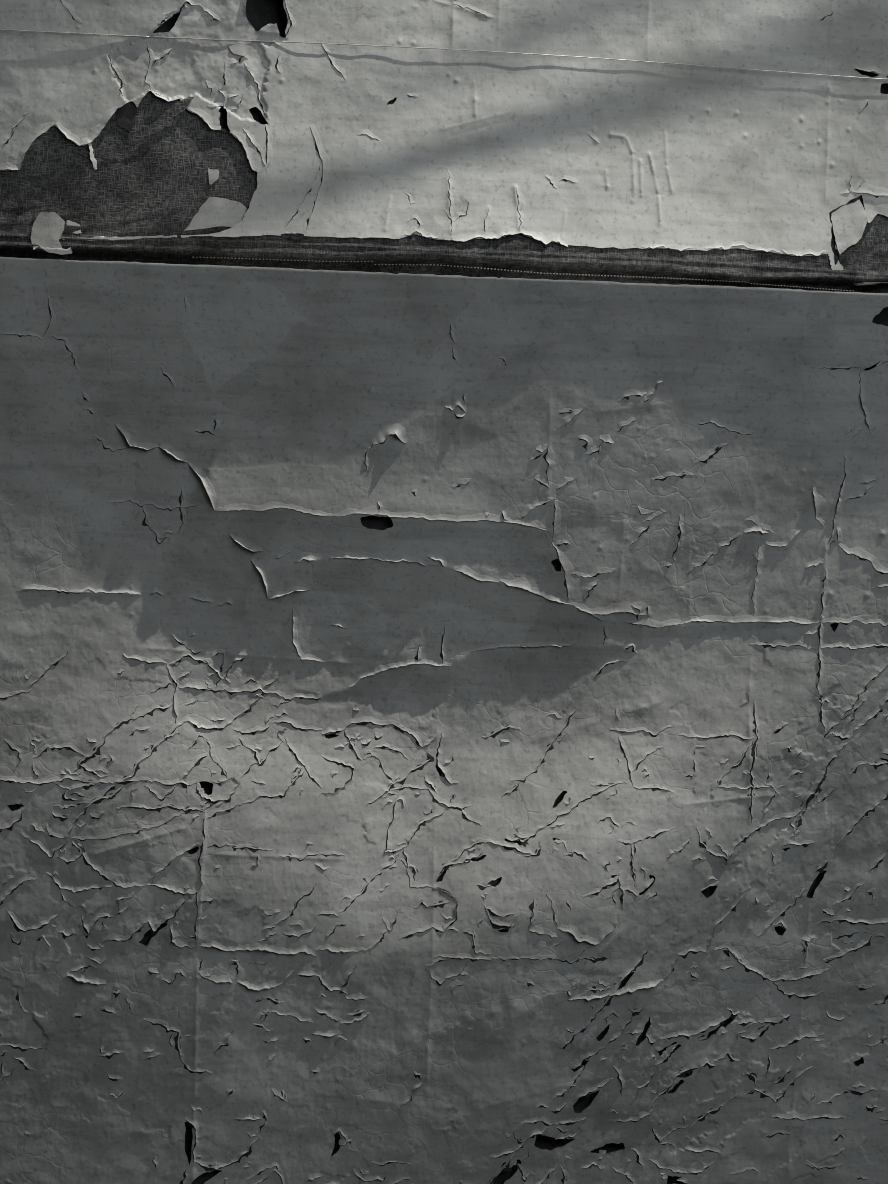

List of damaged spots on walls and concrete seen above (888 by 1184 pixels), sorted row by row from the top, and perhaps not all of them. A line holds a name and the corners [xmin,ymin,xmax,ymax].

peeling [206,0,288,172]
peeling [31,212,82,255]
peeling [184,168,247,231]
peeling [829,195,888,264]
crack [519,408,636,519]
spalling [360,516,393,530]
crack [554,505,685,601]
crack [0,543,888,985]
peeling [0,806,658,1060]
crack [0,989,232,1137]
crack [425,849,888,1184]
crack [152,1104,414,1184]